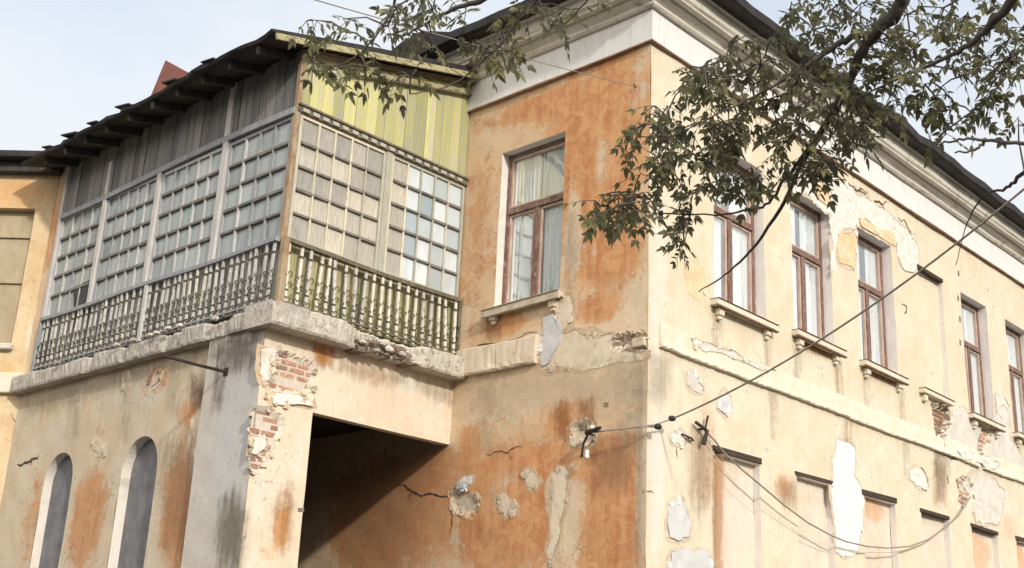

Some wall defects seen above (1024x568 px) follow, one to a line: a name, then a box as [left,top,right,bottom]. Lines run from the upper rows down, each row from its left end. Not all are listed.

flaking render [776,159,920,277]
flaking render [537,306,649,372]
crack [17,455,39,466]
flaking render [246,343,318,475]
spalling [931,403,955,445]
flaking render [947,390,1011,527]
damp [219,493,244,568]
crack [396,484,453,531]
flaking render [447,486,481,520]
peeling [520,464,572,568]
flaking render [664,495,715,568]
flaking render [828,437,866,561]